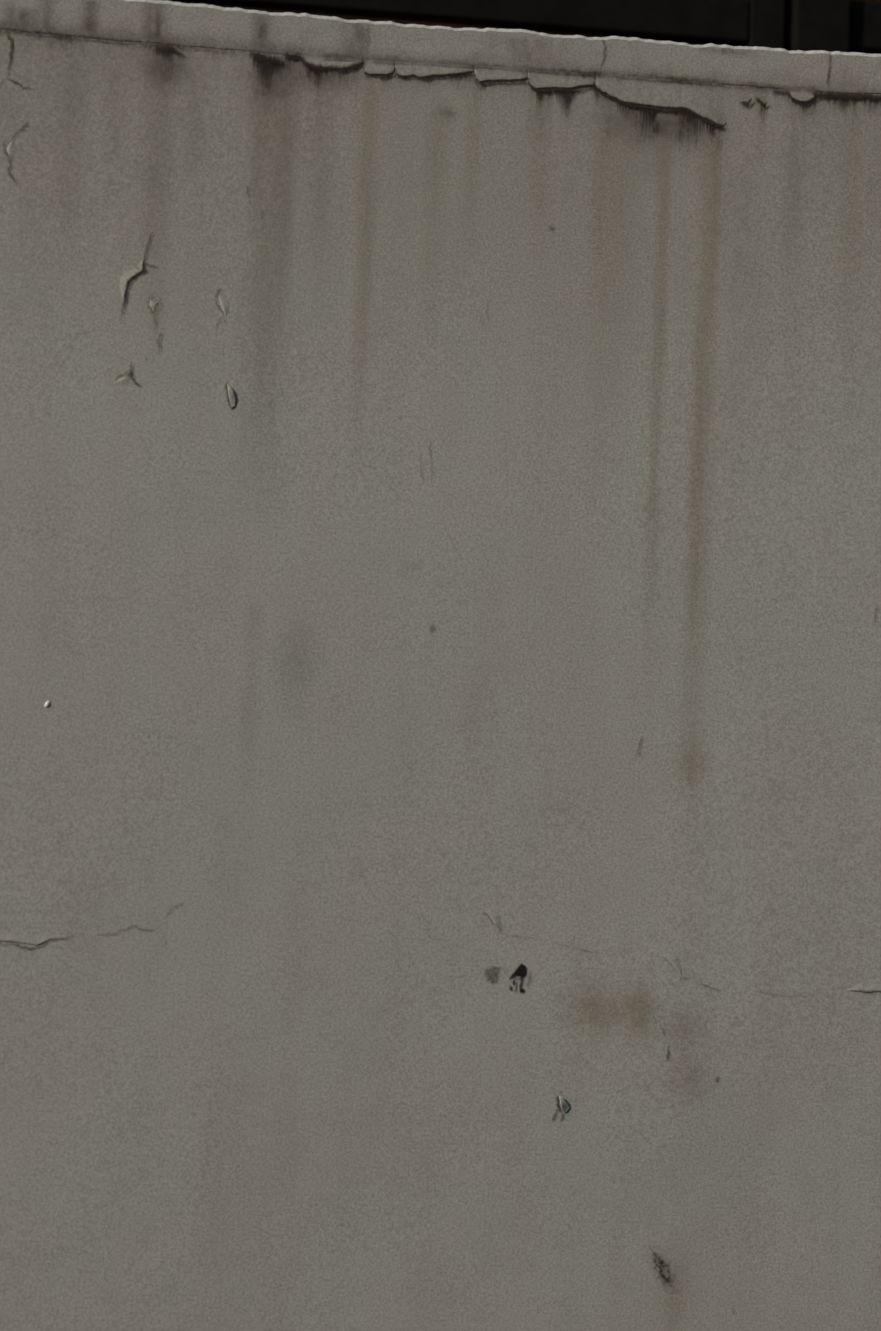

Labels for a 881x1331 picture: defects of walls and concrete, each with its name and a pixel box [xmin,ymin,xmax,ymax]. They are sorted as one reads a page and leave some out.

crack [9,41,20,85]
flaking render [284,53,727,127]
flaking render [788,88,816,102]
water stain [742,90,881,112]
crack [120,239,160,347]
crack [113,365,137,386]
crack [848,983,881,993]